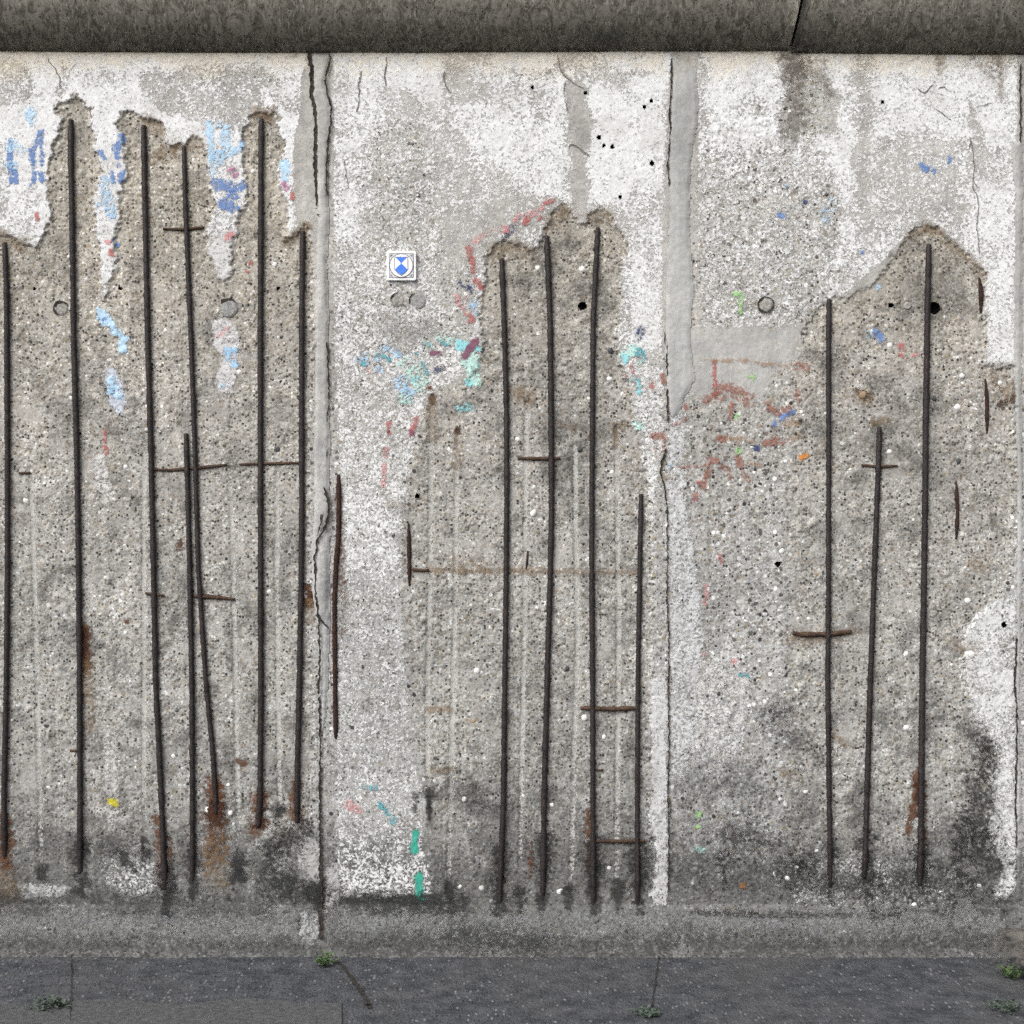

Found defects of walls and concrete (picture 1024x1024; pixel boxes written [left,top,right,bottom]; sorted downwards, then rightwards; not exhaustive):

crack [323,341,331,457]
spalling [0,51,755,946]
spalling [697,51,1019,910]
rust [75,624,94,675]
crack [313,487,331,940]
crack [659,448,671,891]
rust [0,812,16,874]
rust [200,774,231,866]
rust [248,788,269,839]
water stain [0,729,1012,959]
rust [905,767,928,872]